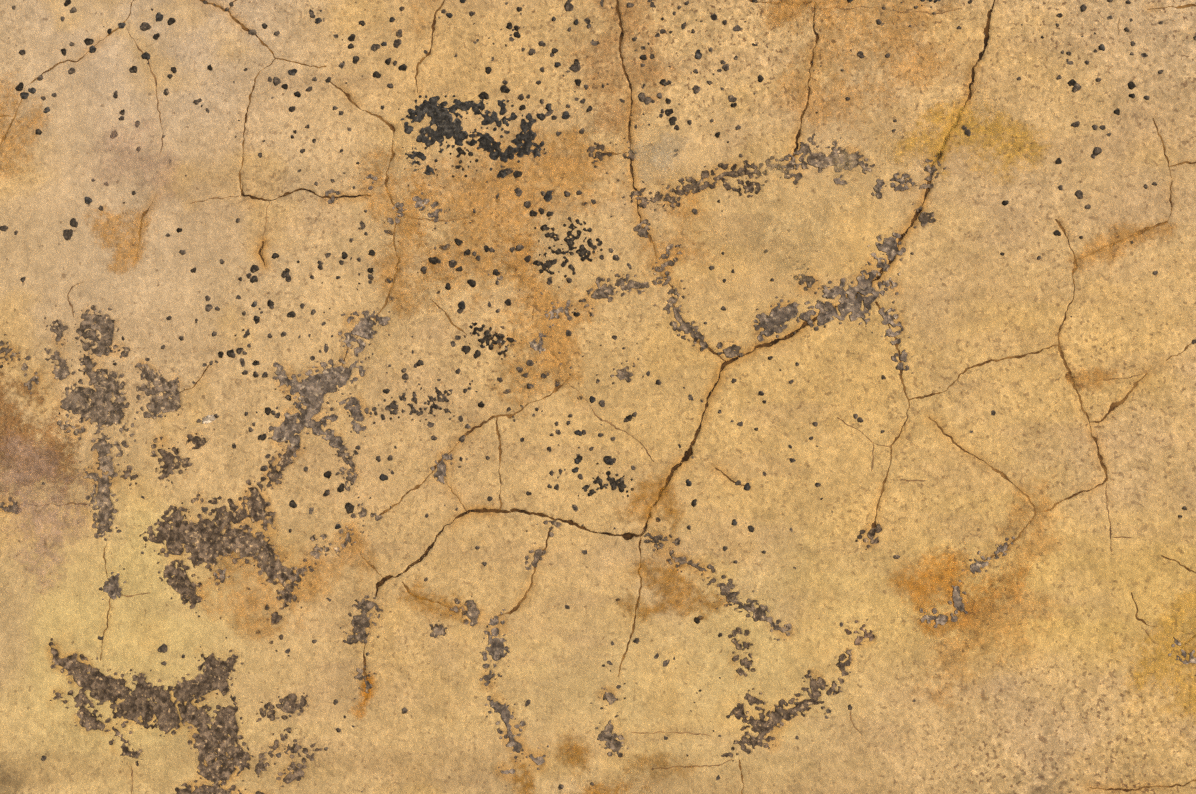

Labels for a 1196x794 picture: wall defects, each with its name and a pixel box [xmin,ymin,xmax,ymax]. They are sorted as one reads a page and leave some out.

crack [0,0,163,153]
crack [190,0,486,366]
crack [134,198,155,262]
crack [356,0,1196,676]
crack [18,500,87,508]
crack [100,545,151,661]
crack [361,644,369,705]
crack [631,729,710,737]
crack [654,759,744,794]
crack [1089,779,1196,792]